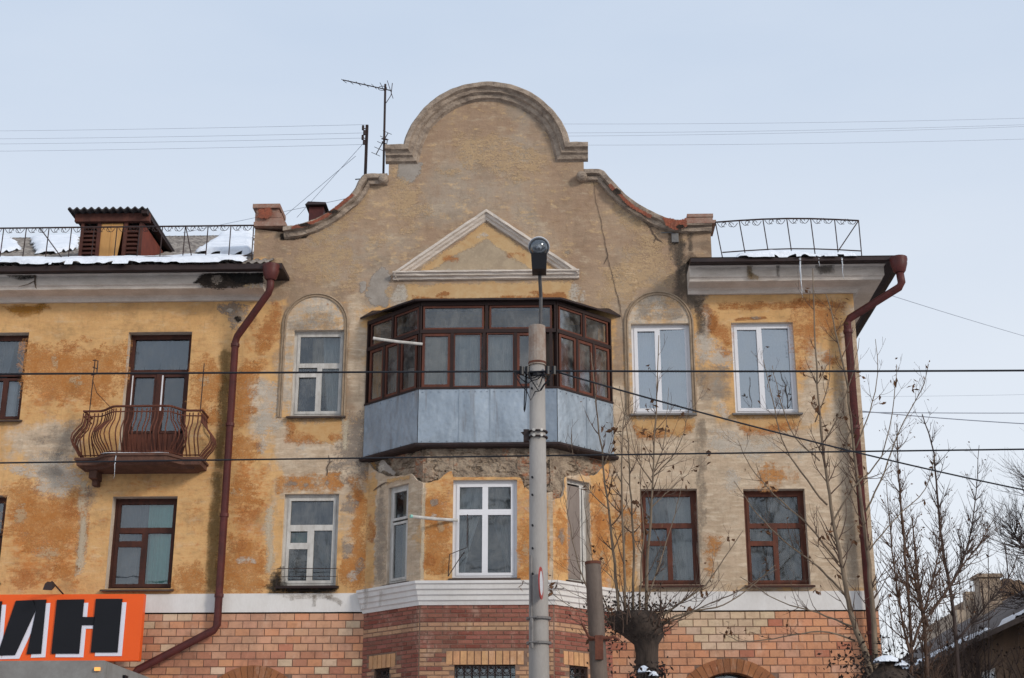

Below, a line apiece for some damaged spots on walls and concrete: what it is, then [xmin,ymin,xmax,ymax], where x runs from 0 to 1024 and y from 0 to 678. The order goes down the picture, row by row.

crack [593,182,623,321]
water stain [207,351,231,592]
flaking render [276,448,529,588]